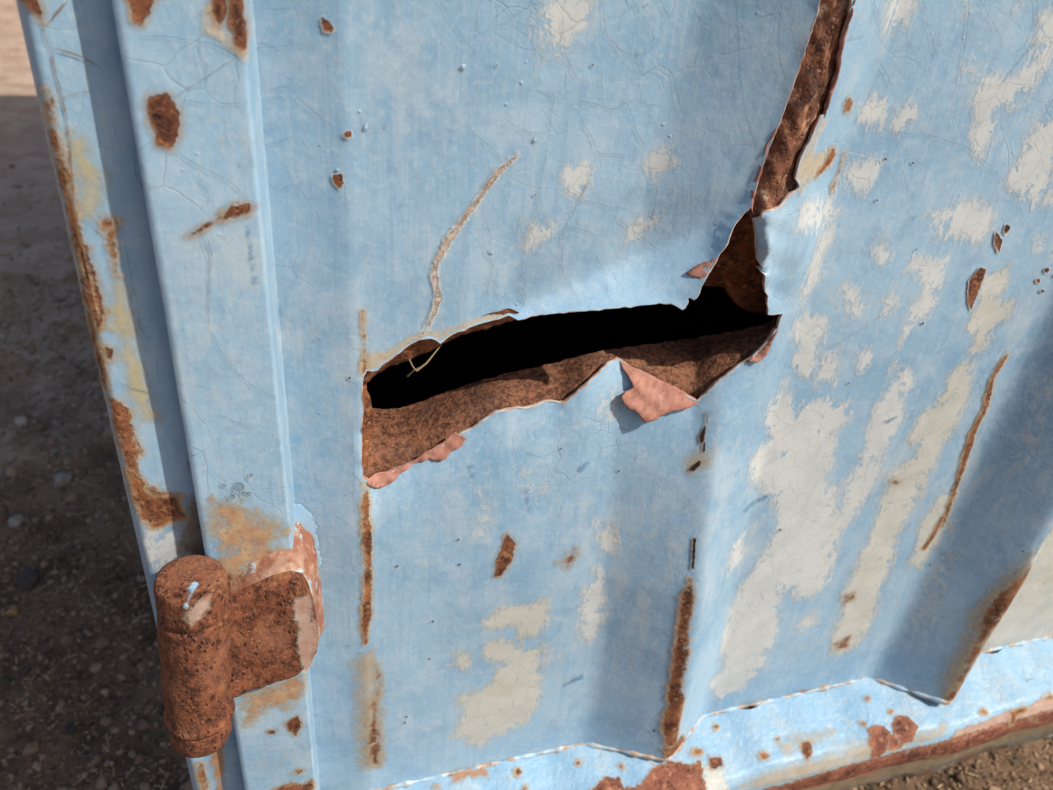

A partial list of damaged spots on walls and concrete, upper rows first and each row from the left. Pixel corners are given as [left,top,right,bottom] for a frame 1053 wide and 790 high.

rust [203,0,250,55]
peeling [540,0,593,56]
peeling [857,93,917,132]
peeling [968,9,1053,166]
peeling [1006,117,1053,211]
rust [39,86,291,582]
rust [357,0,849,790]
peeling [709,195,1014,698]
rust [922,353,1010,550]
peeling [454,597,551,748]
rust [741,692,1053,790]
rust [902,556,1032,705]